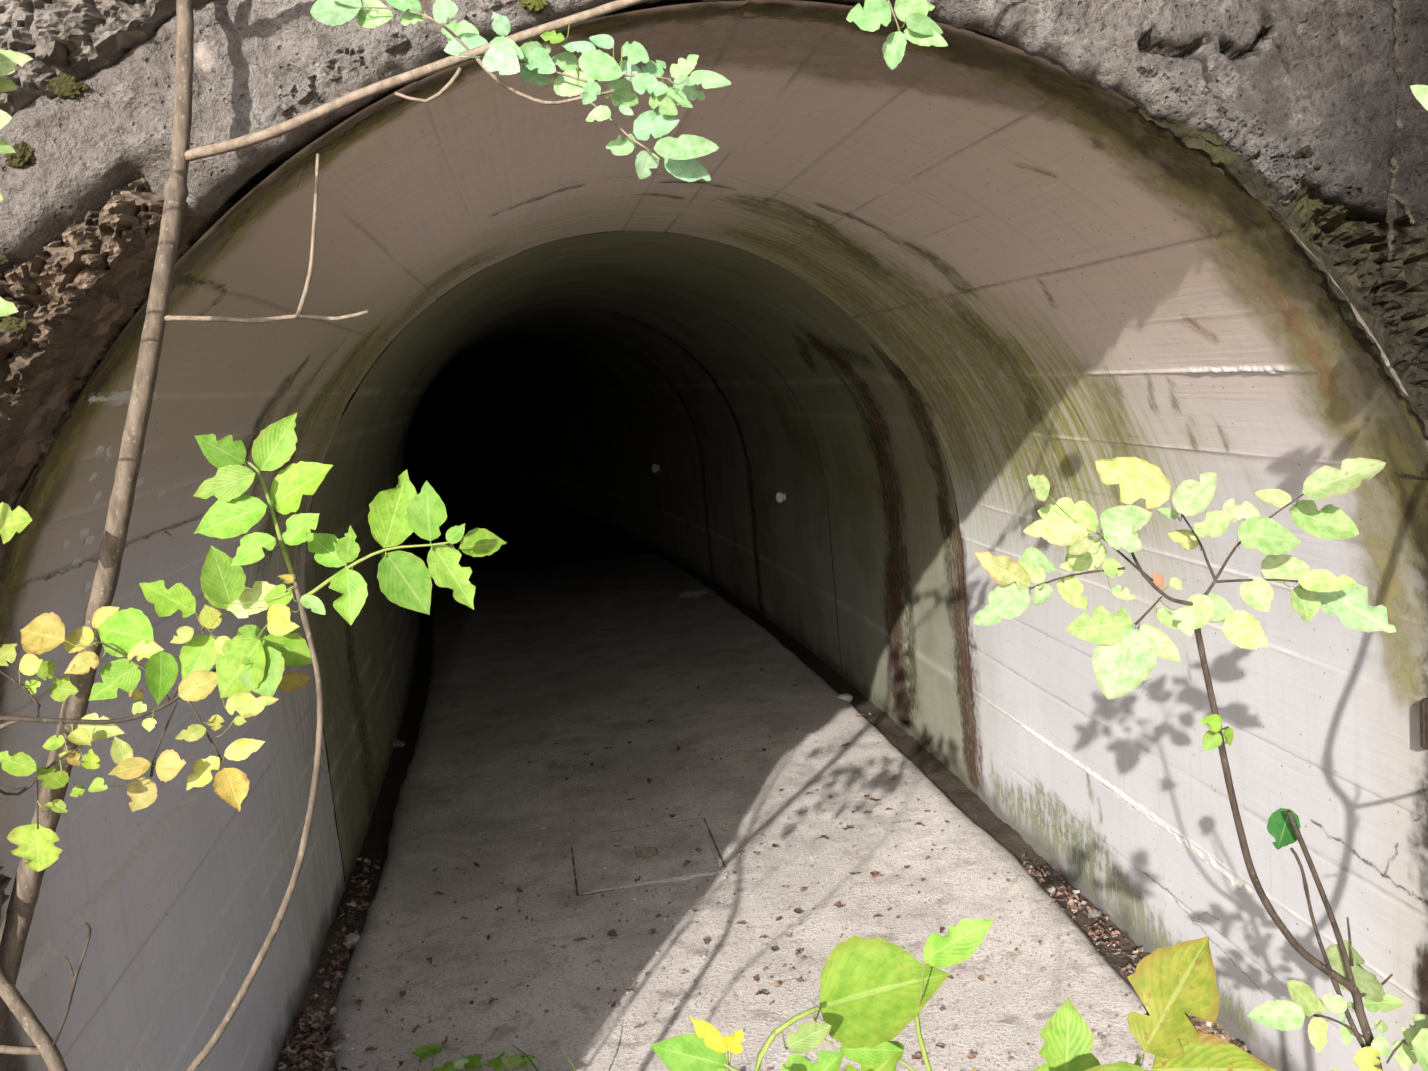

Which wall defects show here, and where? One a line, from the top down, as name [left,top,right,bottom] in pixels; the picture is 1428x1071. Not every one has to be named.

damp [0,306,147,648]
spalling [0,176,164,511]
spalling [175,201,234,316]
damp [169,59,483,309]
damp [516,5,1428,703]
spalling [1113,50,1428,440]
damp [992,772,1171,948]
crack [1312,785,1428,905]
damp [1416,775,1428,902]